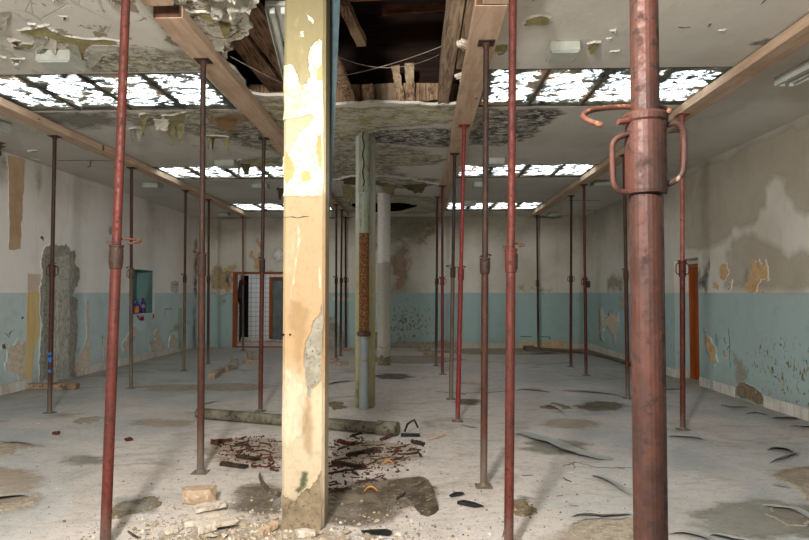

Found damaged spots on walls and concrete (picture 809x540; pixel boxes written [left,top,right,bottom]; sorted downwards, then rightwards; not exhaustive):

peeling [0,11,120,68]
peeling [276,38,356,205]
water stain [332,105,456,214]
peeling [376,175,439,195]
water stain [469,108,562,146]
water stain [391,224,435,290]
flaking render [38,236,91,383]
flaking render [303,296,351,398]
flaking render [736,338,809,407]